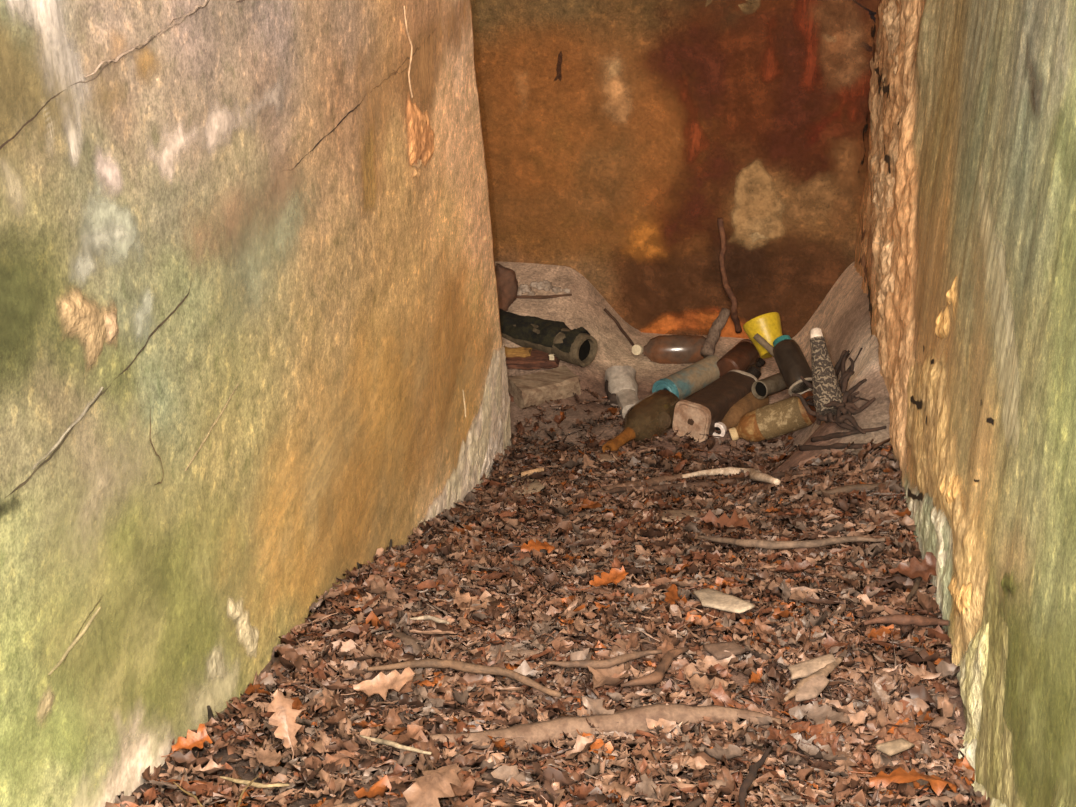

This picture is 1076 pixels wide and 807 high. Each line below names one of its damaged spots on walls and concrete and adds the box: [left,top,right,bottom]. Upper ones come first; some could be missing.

crack [0,0,210,149]
crack [280,27,437,172]
spalling [404,6,434,180]
corrosion [630,0,873,256]
spalling [59,290,119,368]
crack [0,284,191,515]
corrosion [640,309,750,339]